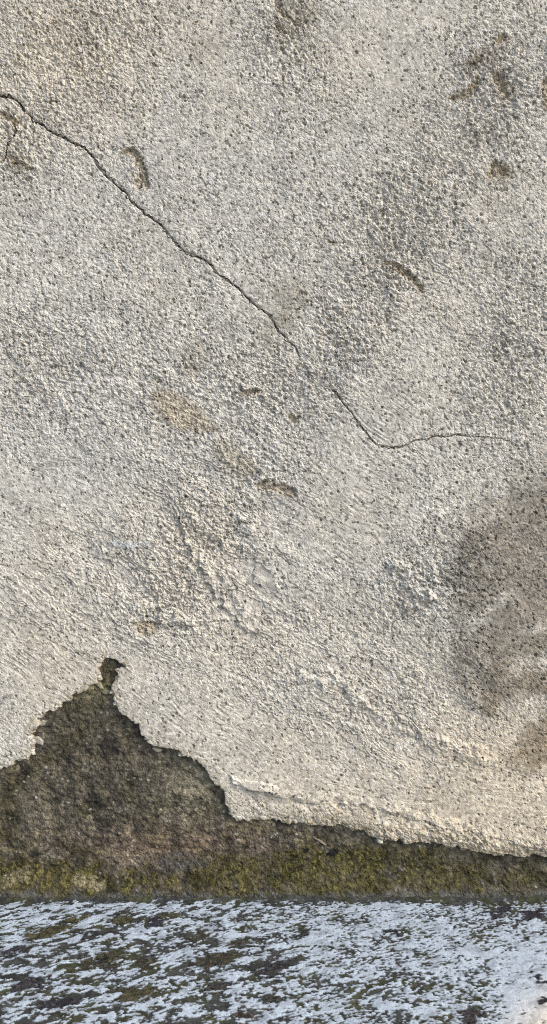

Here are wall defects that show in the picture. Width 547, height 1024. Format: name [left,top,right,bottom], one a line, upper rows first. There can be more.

crack [0,93,512,449]
spalling [0,658,281,827]